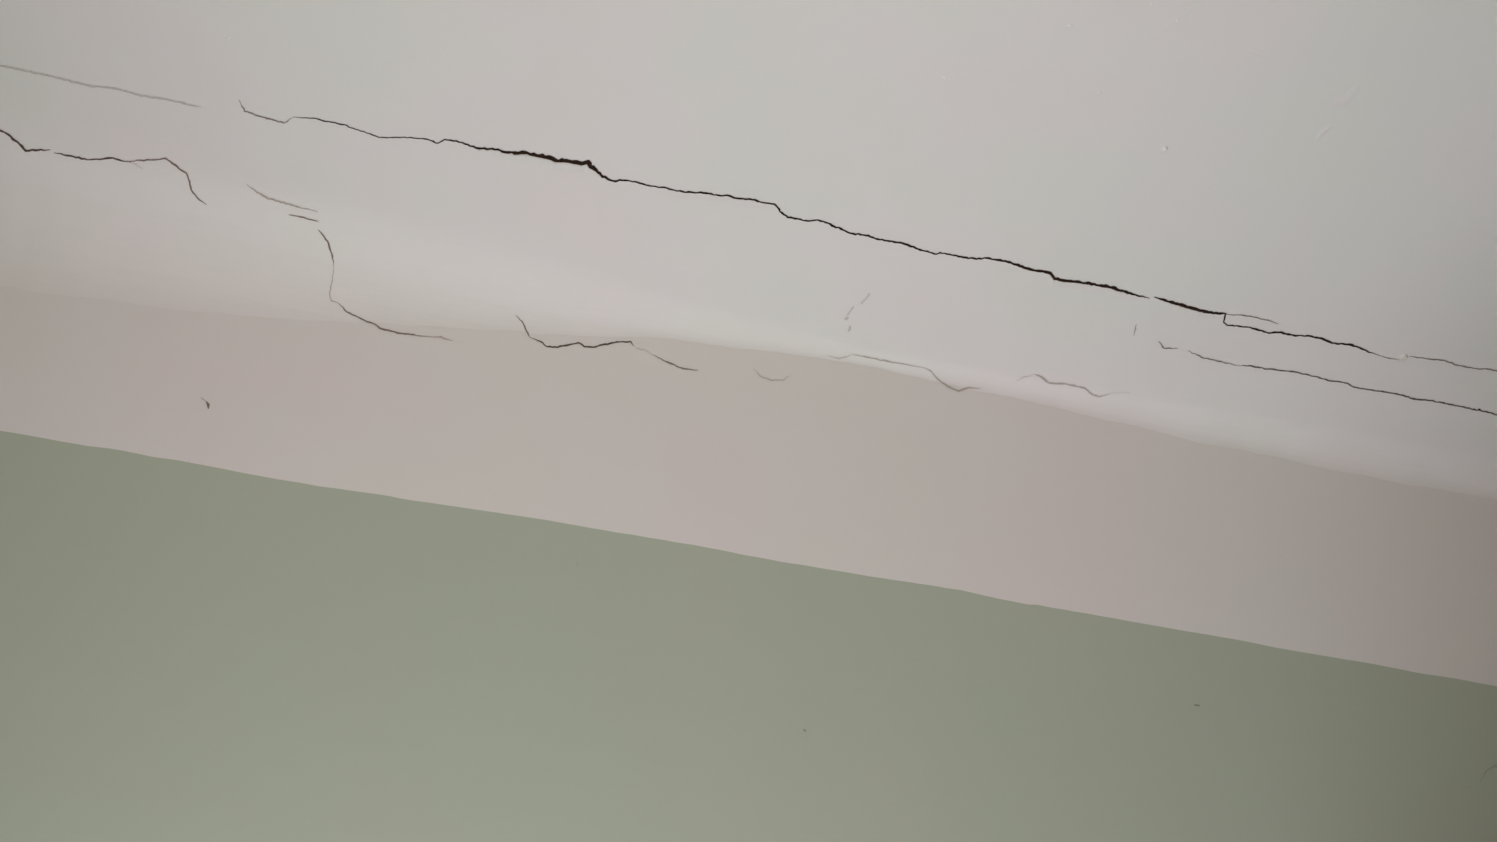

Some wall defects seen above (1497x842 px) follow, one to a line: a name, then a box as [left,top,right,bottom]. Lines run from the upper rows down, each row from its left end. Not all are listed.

crack [0,65,201,107]
crack [0,130,207,205]
crack [239,101,1497,415]